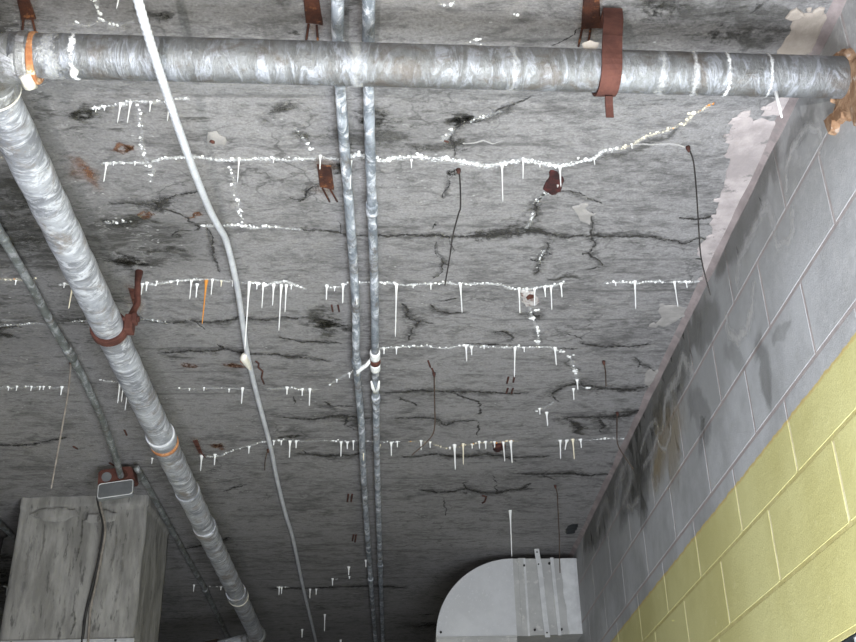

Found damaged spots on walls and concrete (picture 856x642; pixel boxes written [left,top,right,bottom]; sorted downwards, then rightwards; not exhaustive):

peeling [785,7,825,21]
damp [72,97,332,228]
damp [376,52,732,200]
peeling [738,106,773,118]
spalling [823,48,856,135]
crack [303,190,711,277]
damp [141,278,305,345]
crack [140,316,342,360]
damp [302,275,591,399]
crack [552,334,654,432]
damp [367,440,513,470]
crack [385,389,608,516]